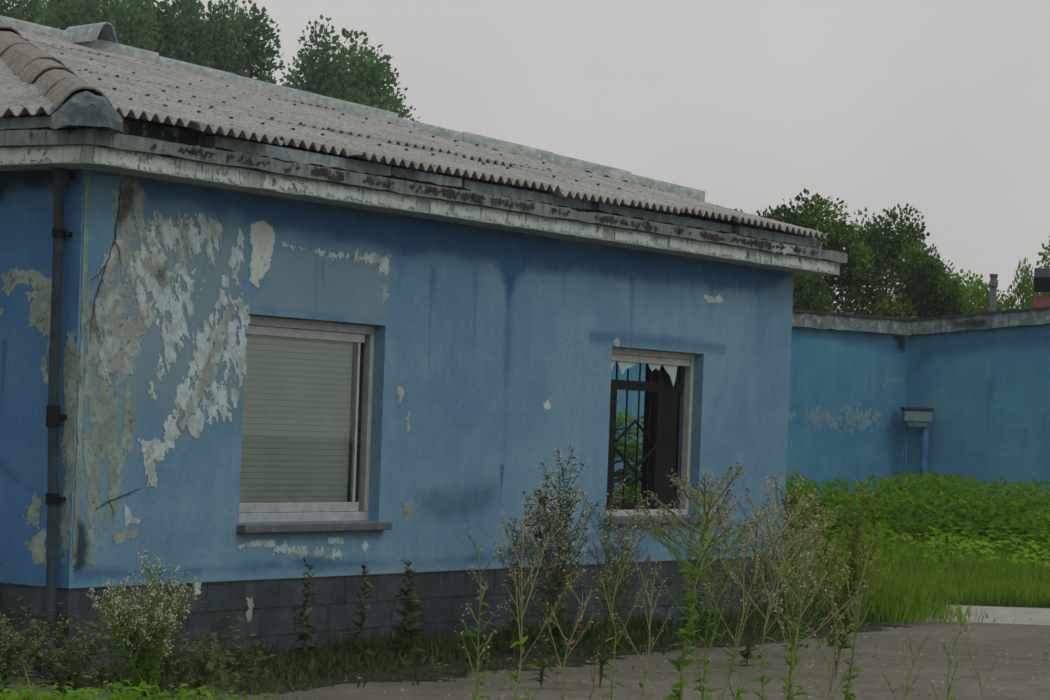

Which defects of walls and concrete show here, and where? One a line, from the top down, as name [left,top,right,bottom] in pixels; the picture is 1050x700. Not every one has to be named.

crack [90,185,122,341]
peeling [0,119,835,573]
crack [96,488,141,520]